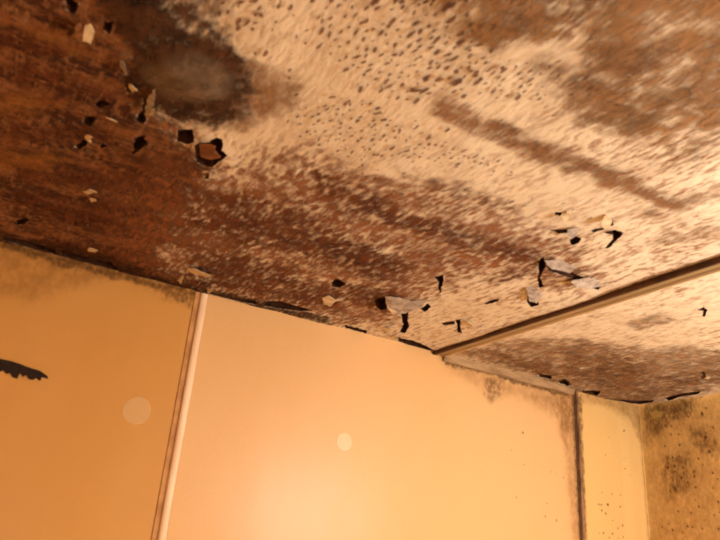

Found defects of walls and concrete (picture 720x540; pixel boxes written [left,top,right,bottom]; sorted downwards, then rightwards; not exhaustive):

peeling [73,23,94,44]
peeling [136,89,156,123]
peeling [131,135,148,154]
peeling [177,129,227,179]
water stain [0,0,605,325]
peeling [550,211,581,245]
peeling [590,215,623,248]
peeling [526,257,601,307]
peeling [322,296,342,309]
peeling [374,296,431,339]
peeling [442,319,473,333]
water stain [461,339,720,434]